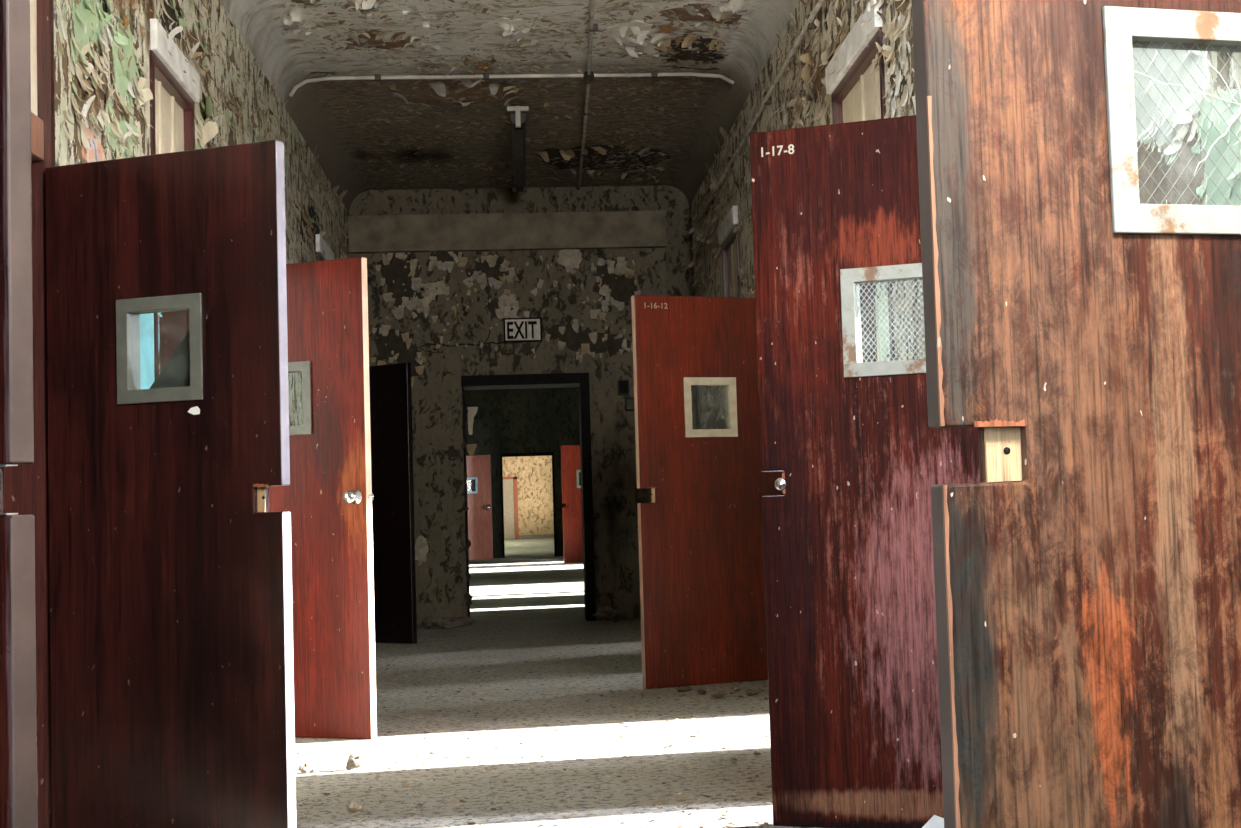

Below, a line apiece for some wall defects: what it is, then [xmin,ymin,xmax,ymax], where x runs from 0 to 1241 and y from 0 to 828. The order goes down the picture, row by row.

peeling [55,0,350,264]
peeling [281,0,748,189]
peeling [688,0,916,298]
peeling [371,249,641,388]
peeling [696,386,725,429]